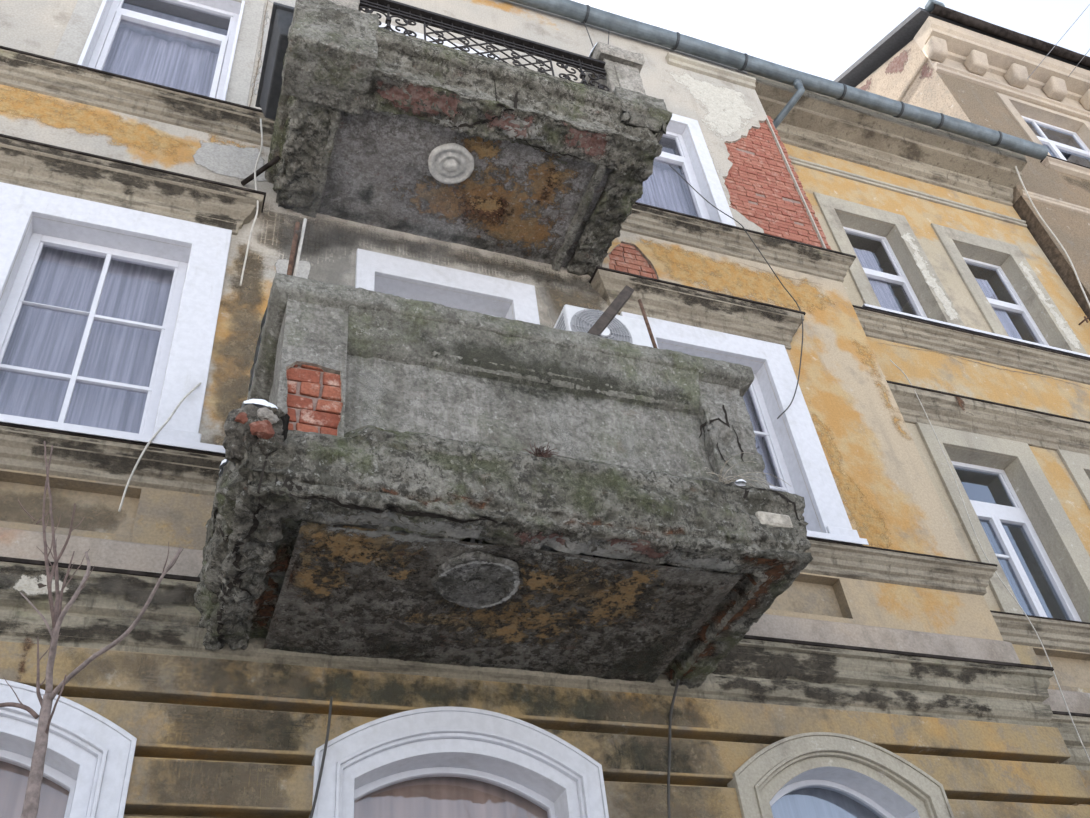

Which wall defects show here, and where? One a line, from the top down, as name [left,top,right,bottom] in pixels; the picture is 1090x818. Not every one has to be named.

crack [249,1,268,107]
flaking render [662,68,832,250]
corrosion [456,196,514,232]
peeling [608,239,831,312]
water stain [7,185,601,482]
flaking render [222,361,344,464]
spalling [18,638,33,679]
spalling [13,574,69,596]
water stain [0,565,197,683]
crack [212,454,498,644]
water stain [712,641,991,717]
water stain [894,655,1020,684]